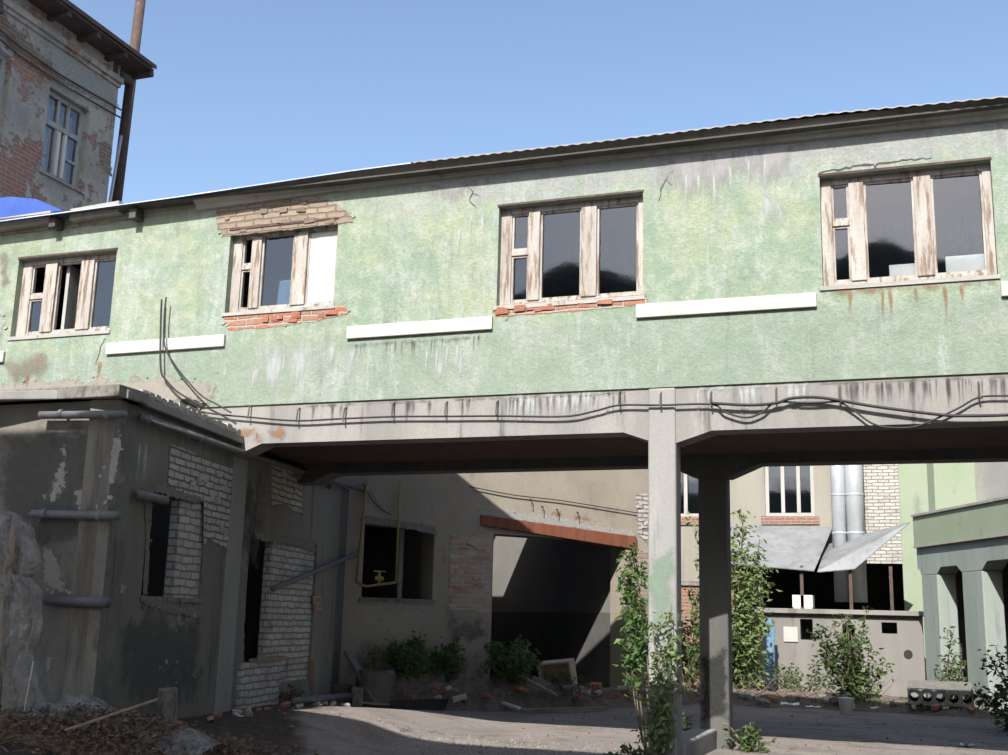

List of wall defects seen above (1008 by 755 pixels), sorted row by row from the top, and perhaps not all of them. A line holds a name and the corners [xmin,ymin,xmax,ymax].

peeling [0,14,119,107]
flaking render [0,130,50,198]
flaking render [99,142,113,177]
flaking render [216,196,355,237]
flaking render [221,305,350,331]
damp [508,396,534,412]
damp [545,393,609,408]
damp [697,385,769,403]
peeling [42,445,82,521]
peeling [96,430,123,511]
damp [122,612,201,698]